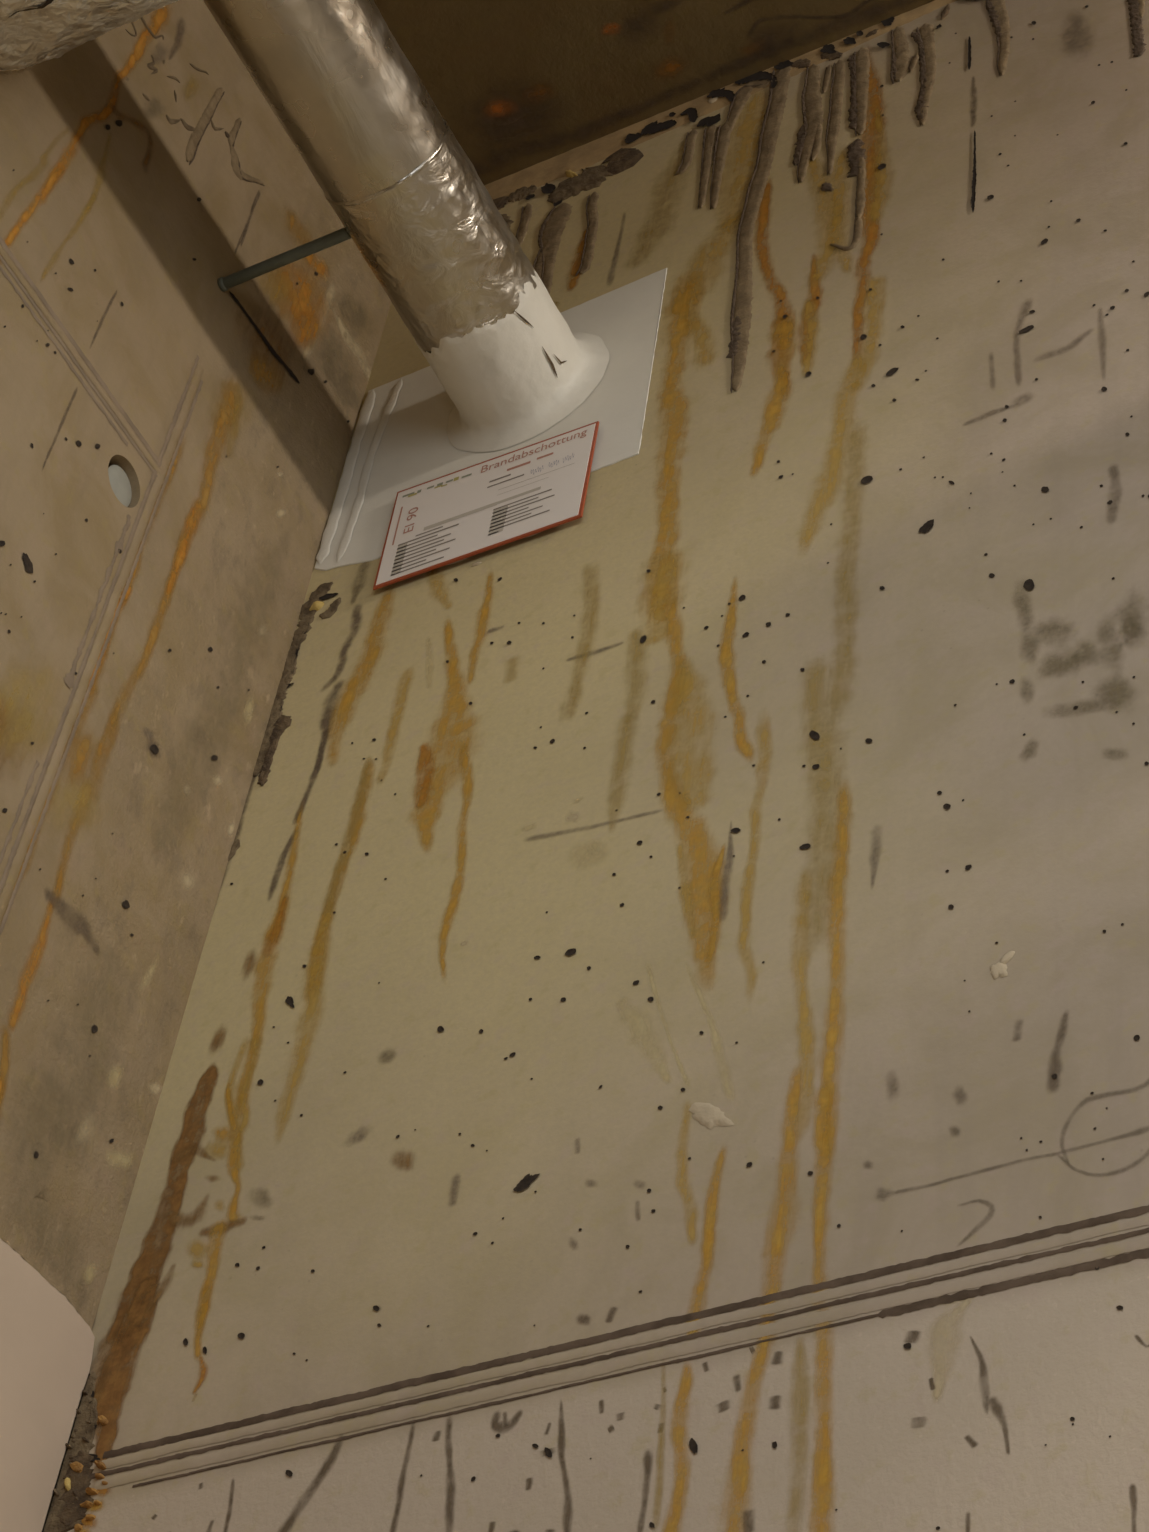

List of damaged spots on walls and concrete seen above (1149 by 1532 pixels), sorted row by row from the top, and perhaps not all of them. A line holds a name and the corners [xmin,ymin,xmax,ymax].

corrosion [752,54,887,542]
corrosion [0,384,239,1105]
corrosion [93,813,301,1461]
crack [221,599,324,885]
corrosion [282,766,371,1119]
corrosion [416,576,492,971]
corrosion [633,217,738,968]
corrosion [679,1151,724,1334]
corrosion [719,586,768,769]
corrosion [728,671,849,1532]
spalling [43,1371,109,1532]
corrosion [657,1367,692,1532]